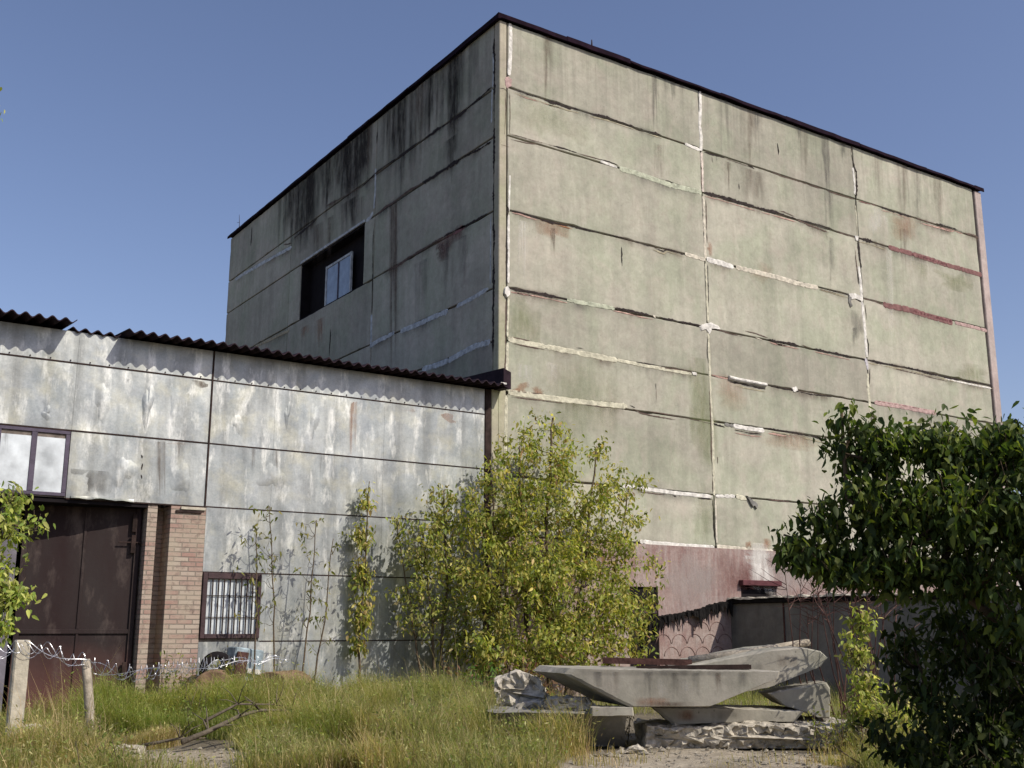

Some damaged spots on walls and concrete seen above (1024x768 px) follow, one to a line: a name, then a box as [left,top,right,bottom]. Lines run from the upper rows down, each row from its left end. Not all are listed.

damp [448,55,458,158]
damp [287,127,369,235]
crack [284,39,992,543]